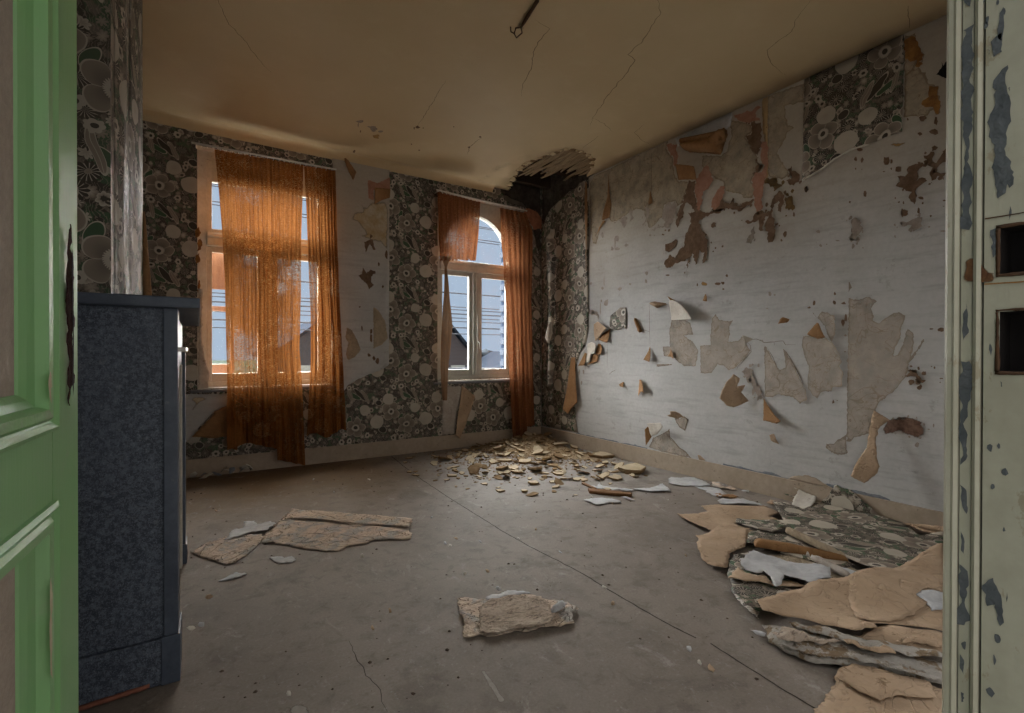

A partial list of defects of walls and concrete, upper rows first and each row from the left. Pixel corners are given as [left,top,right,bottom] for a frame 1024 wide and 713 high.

peeling [662,121,808,274]
peeling [883,116,946,238]
peeling [960,0,1006,230]
peeling [987,65,1014,198]
flaking render [332,150,390,392]
peeling [563,282,610,414]
peeling [576,411,684,449]
peeling [649,297,691,320]
peeling [719,363,780,444]
peeling [723,411,890,500]
peeling [959,361,972,465]
peeling [957,533,1008,665]